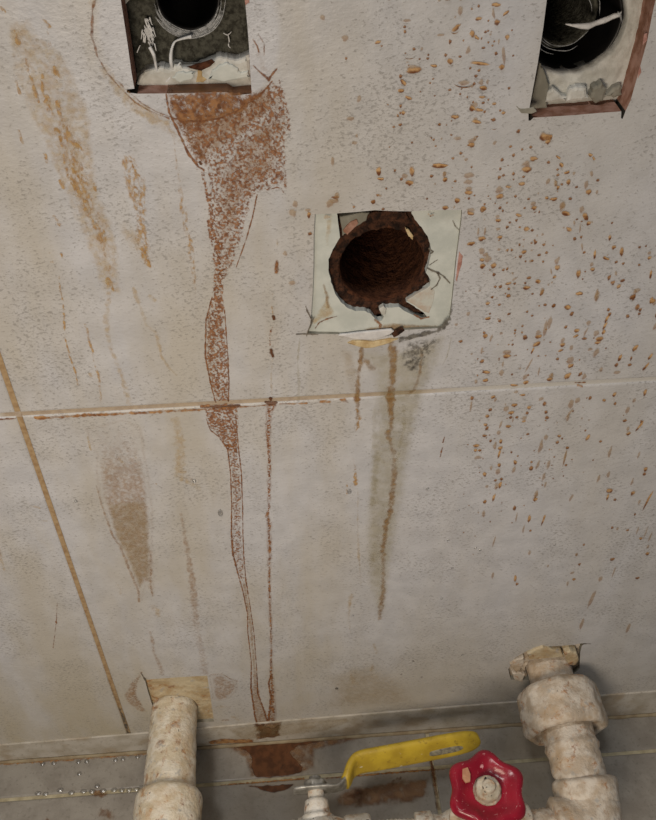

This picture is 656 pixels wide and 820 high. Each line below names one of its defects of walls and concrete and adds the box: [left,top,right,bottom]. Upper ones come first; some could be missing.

peeling [339,210,413,240]
spalling [339,327,405,348]
rust [165,59,350,792]
spalling [510,645,579,682]